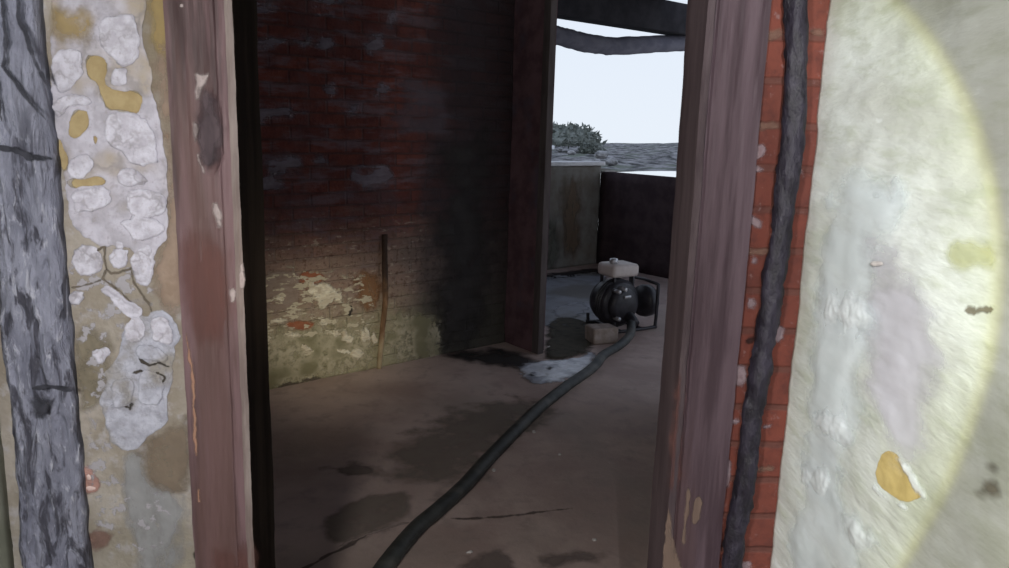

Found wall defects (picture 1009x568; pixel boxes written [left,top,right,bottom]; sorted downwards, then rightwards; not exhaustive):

peeling [195,74,208,99]
peeling [213,203,222,226]
crack [72,246,152,312]
peeling [50,0,197,549]
peeling [266,267,378,366]
peeling [790,181,903,568]
peeling [873,451,925,509]
damp [326,493,409,542]
crack [455,509,564,520]
damp [465,551,511,568]
damp [542,552,596,567]